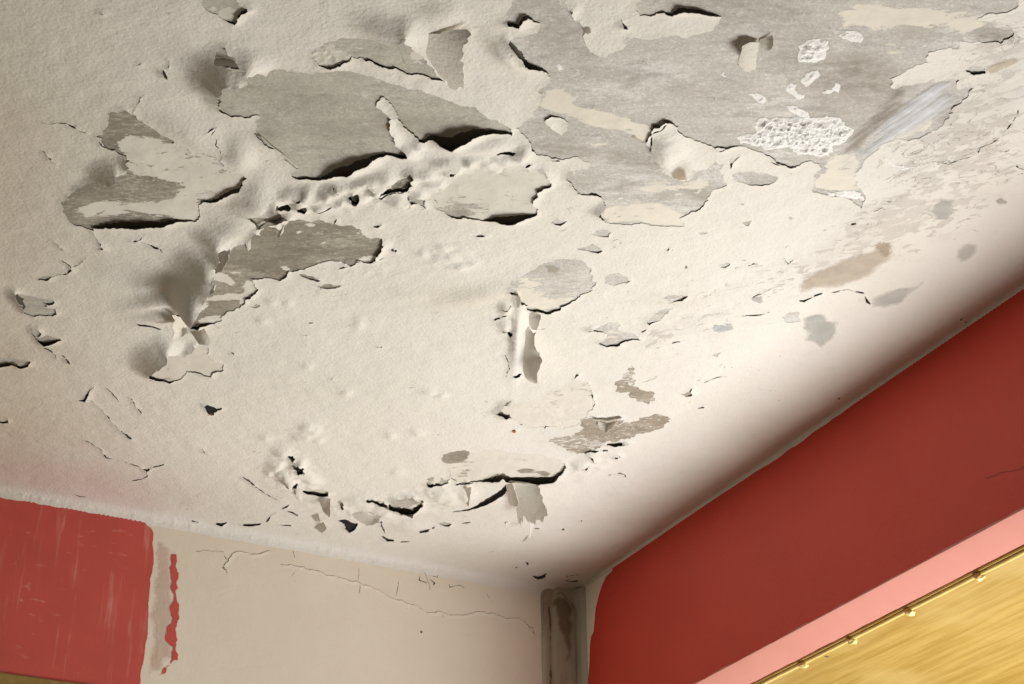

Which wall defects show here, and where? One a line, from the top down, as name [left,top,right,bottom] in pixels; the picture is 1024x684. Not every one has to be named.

peeling [54,110,383,386]
peeling [175,0,1019,384]
peeling [272,367,670,542]
crack [188,476,551,636]
leakage [554,598,571,647]